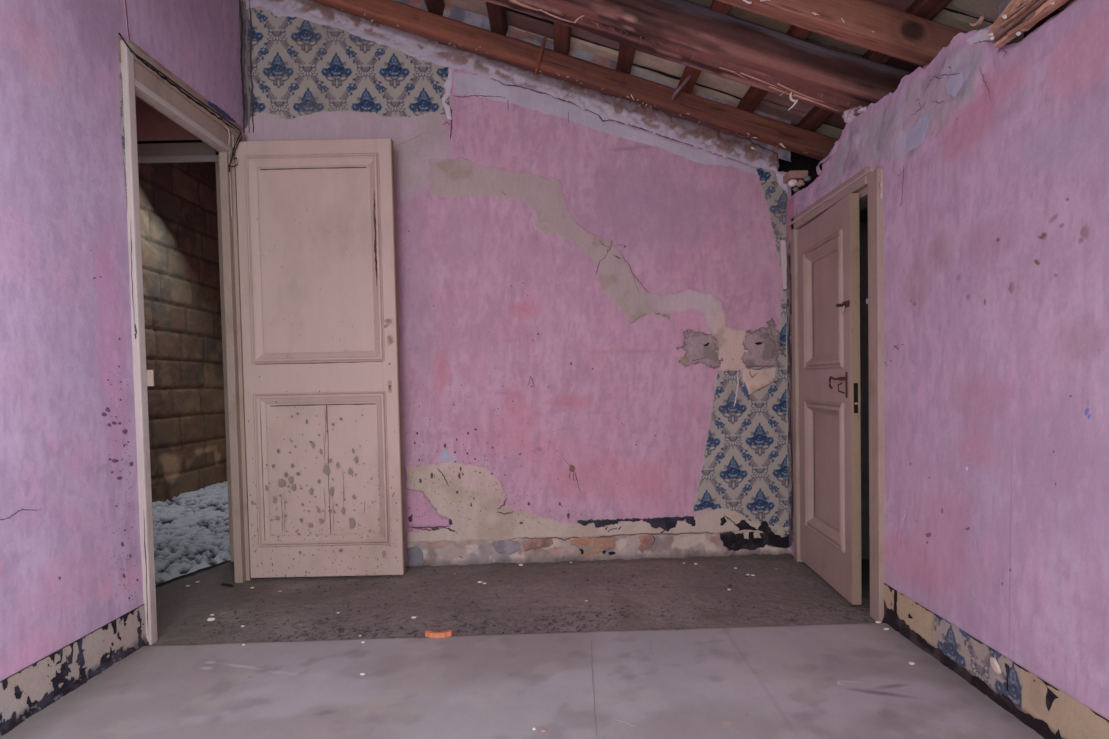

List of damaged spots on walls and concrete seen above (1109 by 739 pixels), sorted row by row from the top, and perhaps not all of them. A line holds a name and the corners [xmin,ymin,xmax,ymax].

flaking render [247,0,840,184]
flaking render [842,106,867,124]
flaking render [676,329,724,369]
flaking render [741,318,781,369]
flaking render [404,448,791,567]
peeling [0,604,149,736]
peeling [882,583,1063,739]